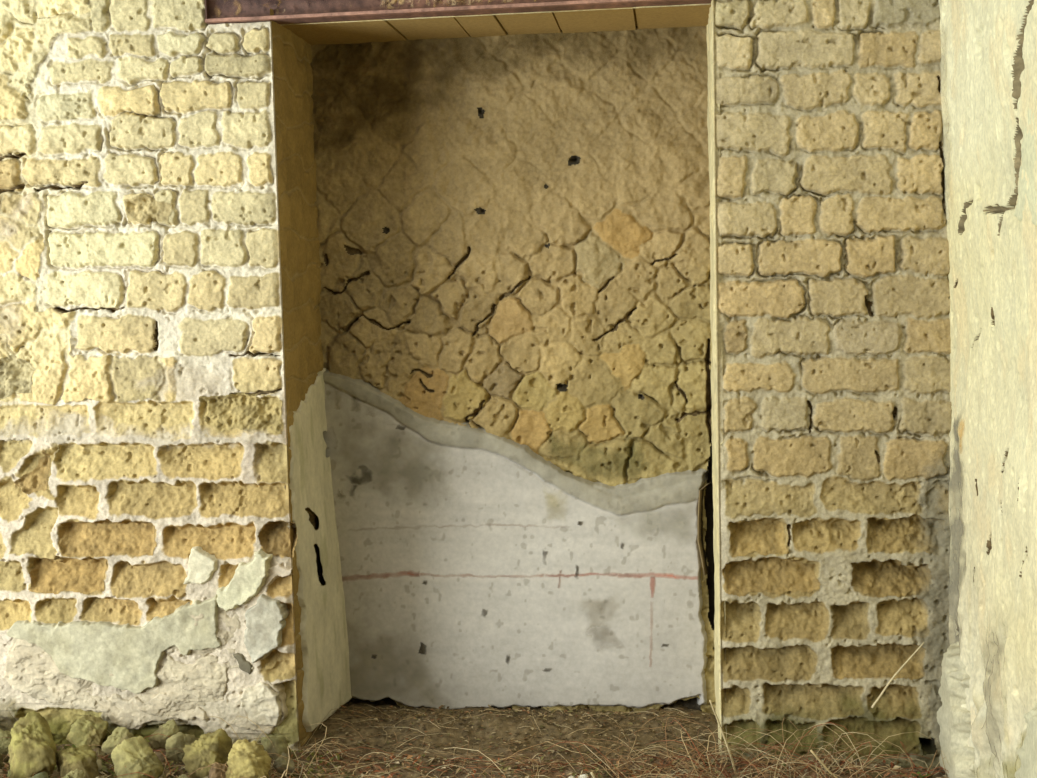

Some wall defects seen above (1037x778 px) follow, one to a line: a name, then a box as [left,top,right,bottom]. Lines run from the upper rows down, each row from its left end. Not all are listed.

crack [939,0,1034,236]
crack [0,152,26,161]
crack [0,181,88,194]
crack [324,245,370,295]
crack [447,247,471,280]
crack [340,315,410,332]
crack [472,276,530,337]
crack [593,308,637,342]
crack [410,369,434,392]
crack [465,400,485,428]
crack [675,339,715,630]
peeling [4,519,298,735]